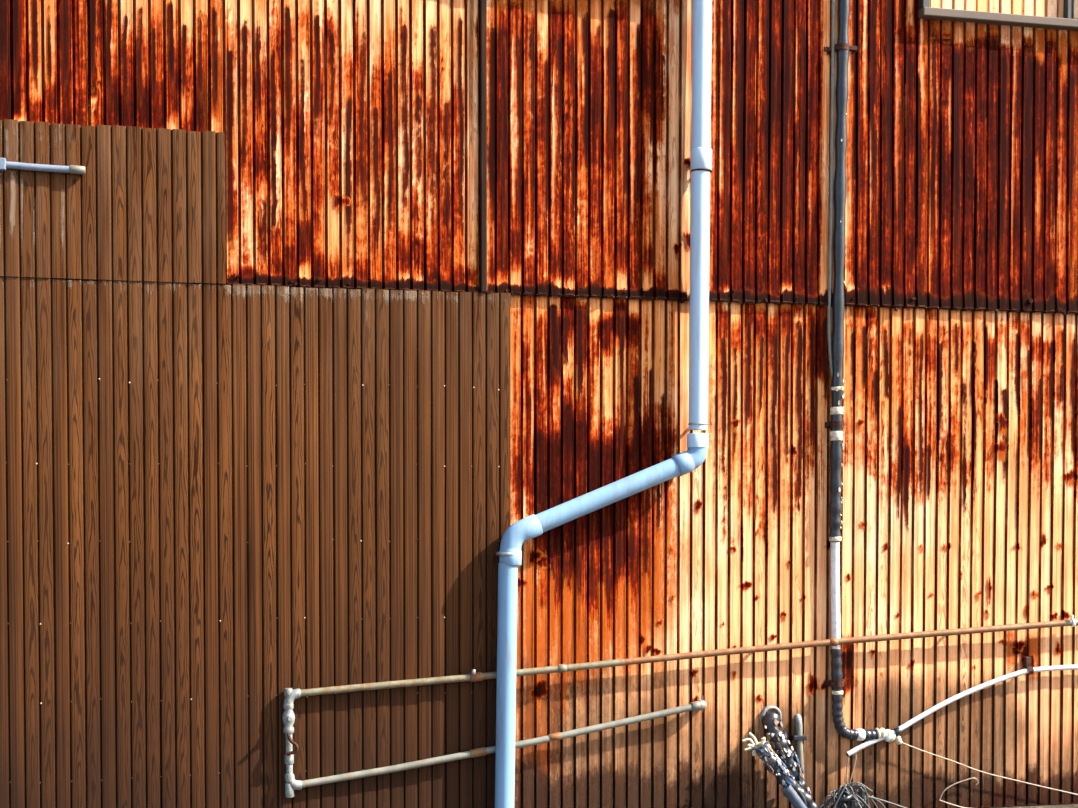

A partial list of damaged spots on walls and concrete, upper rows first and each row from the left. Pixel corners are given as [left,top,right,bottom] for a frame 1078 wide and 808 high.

rust [0,0,690,521]
rust [695,0,1078,567]
rust [516,479,680,777]
rust [738,581,758,602]
rust [976,577,993,619]
rust [1024,583,1054,618]
rust [1050,610,1071,620]
rust [807,673,826,695]
rust [841,634,875,705]
rust [998,631,1038,679]